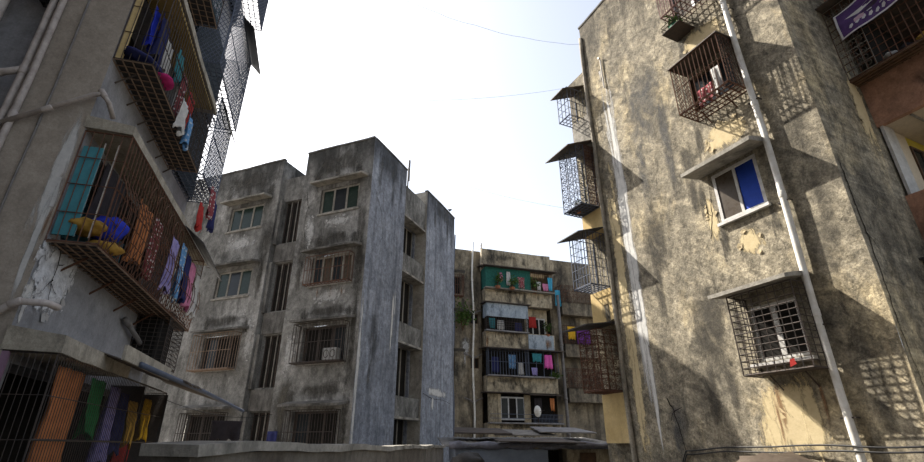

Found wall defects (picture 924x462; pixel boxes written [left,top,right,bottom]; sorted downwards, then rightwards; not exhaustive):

water stain [691,186,707,215]
water stain [295,209,377,444]
water stain [694,299,739,408]
water stain [276,384,339,442]
water stain [429,388,446,410]
water stain [760,372,837,462]